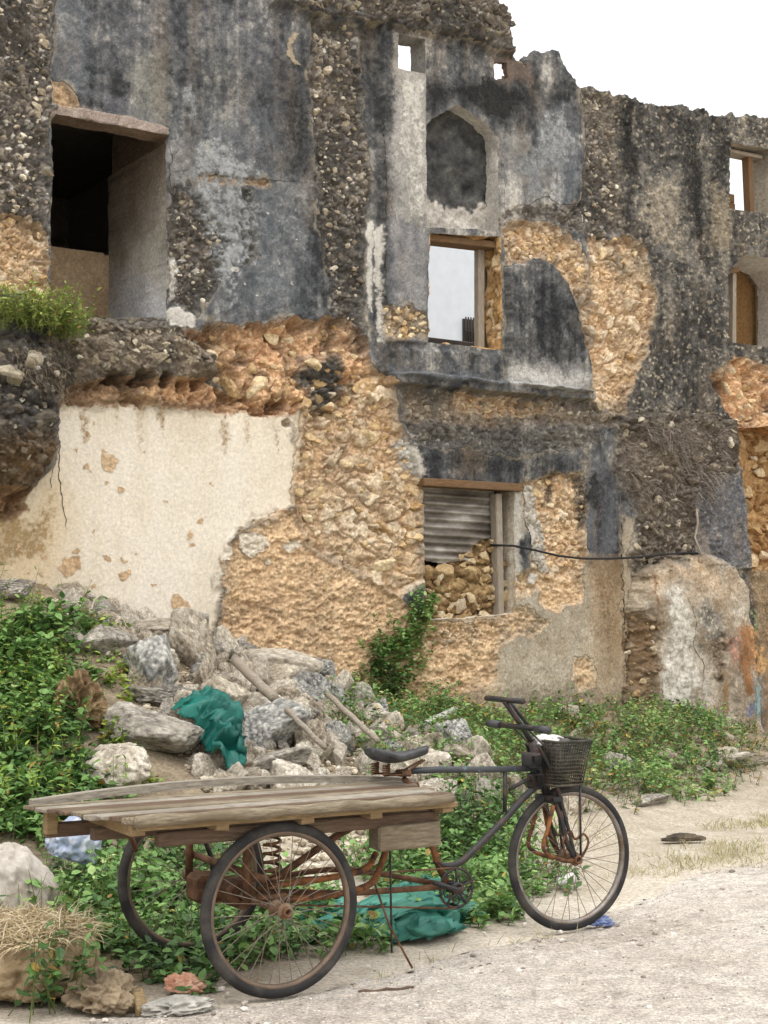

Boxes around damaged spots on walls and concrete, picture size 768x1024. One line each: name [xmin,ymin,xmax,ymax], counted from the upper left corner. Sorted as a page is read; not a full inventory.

damp [182,85,197,120]
damp [176,131,268,309]
damp [622,98,704,259]
efflorescence [166,257,196,328]
efflorescence [365,220,387,344]
spalling [61,15,768,711]
crack [50,420,67,527]
efflorescence [391,439,426,477]
damp [467,447,613,528]
peeling [57,548,81,577]